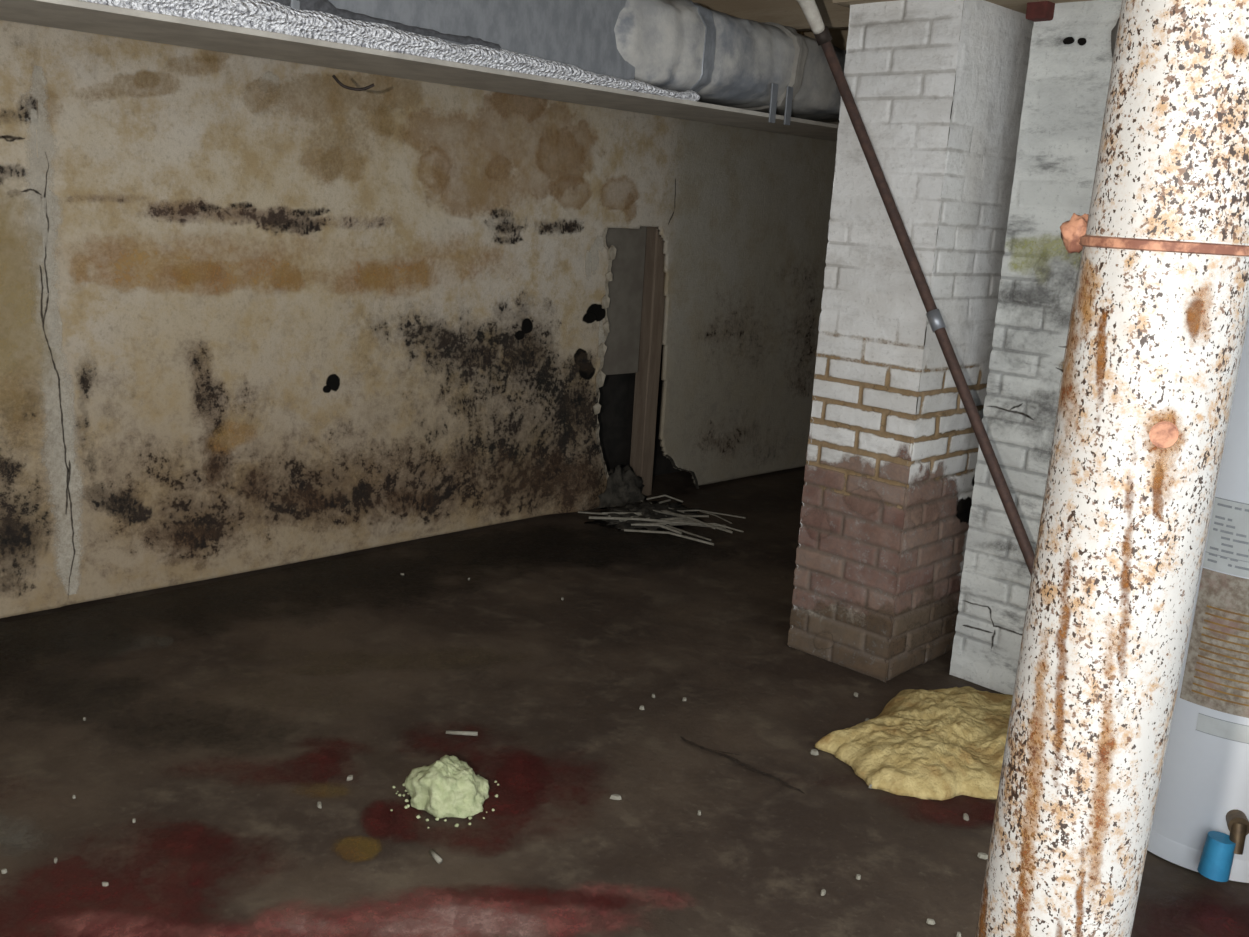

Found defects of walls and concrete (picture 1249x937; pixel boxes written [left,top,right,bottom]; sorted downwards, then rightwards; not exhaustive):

corrosion [1232,39,1247,55]
crack [0,135,75,596]
water stain [148,200,352,234]
water stain [485,209,584,244]
corrosion [1060,271,1107,433]
corrosion [1187,286,1210,338]
water stain [0,292,708,672]
peeling [792,338,987,633]
corrosion [1105,482,1133,677]
corrosion [1145,414,1185,520]
corrosion [1016,559,1071,937]
corrosion [1057,701,1115,937]